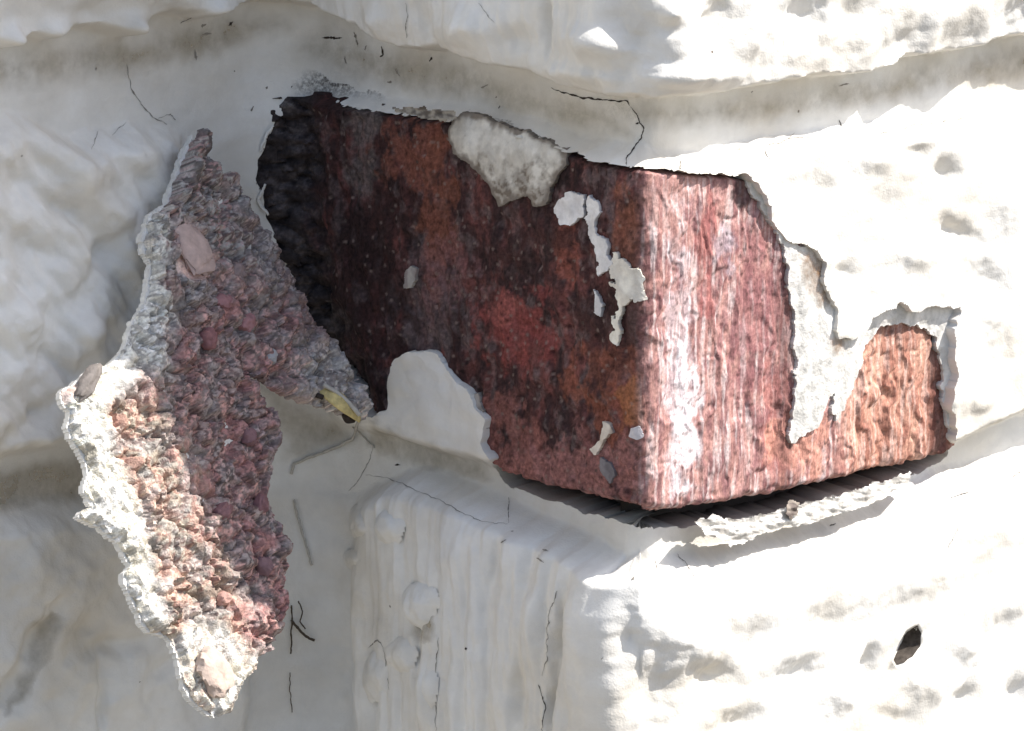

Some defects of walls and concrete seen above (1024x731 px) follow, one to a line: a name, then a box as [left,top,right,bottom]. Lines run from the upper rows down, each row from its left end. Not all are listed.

crack [127,66,176,124]
crack [552,88,644,165]
spalling [56,91,954,719]
crack [351,447,509,524]